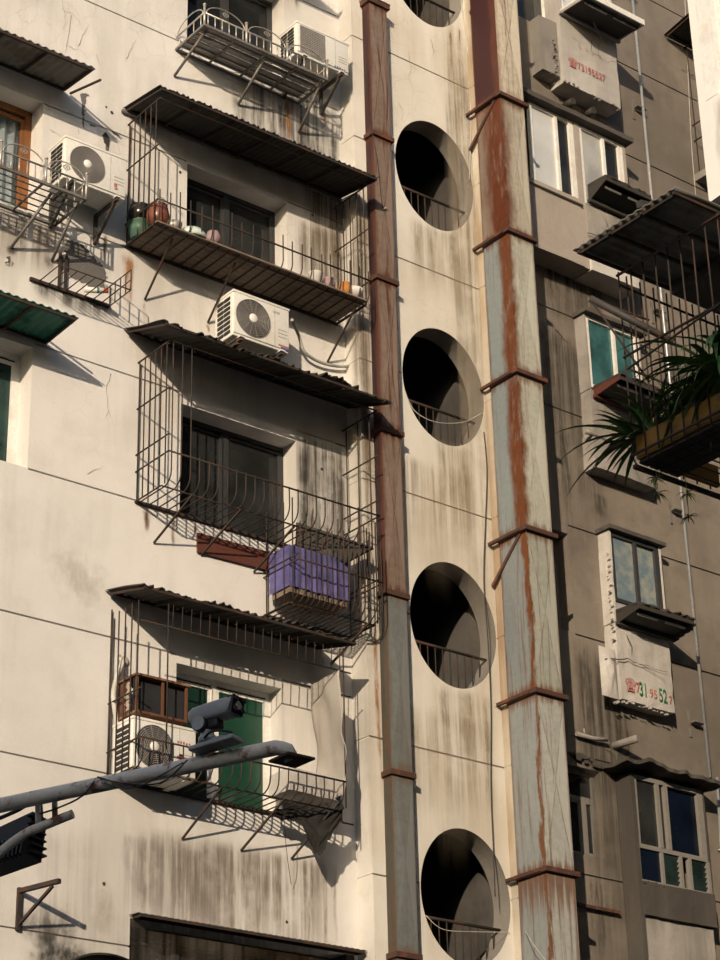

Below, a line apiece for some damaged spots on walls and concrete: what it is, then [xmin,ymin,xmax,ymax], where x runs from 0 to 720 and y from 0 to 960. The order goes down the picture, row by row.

leakage [217,847,267,893]